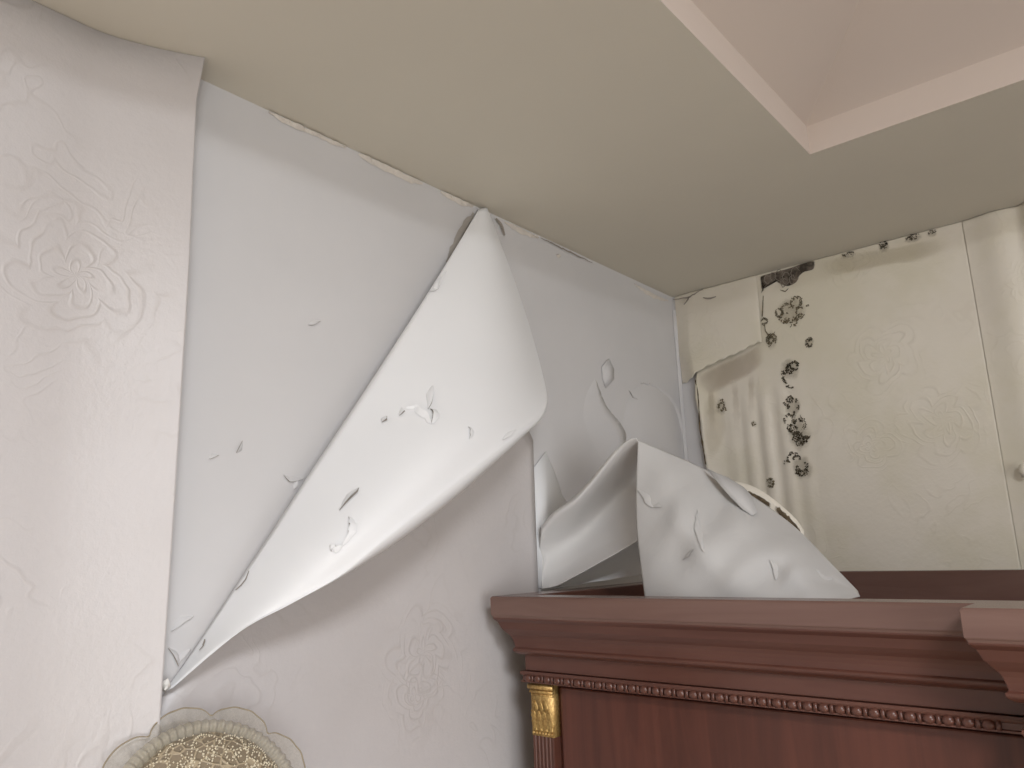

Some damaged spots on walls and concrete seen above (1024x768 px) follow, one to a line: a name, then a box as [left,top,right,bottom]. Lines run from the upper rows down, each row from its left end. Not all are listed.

peeling [159,208,547,768]
peeling [675,275,762,383]
damp [695,222,1021,571]